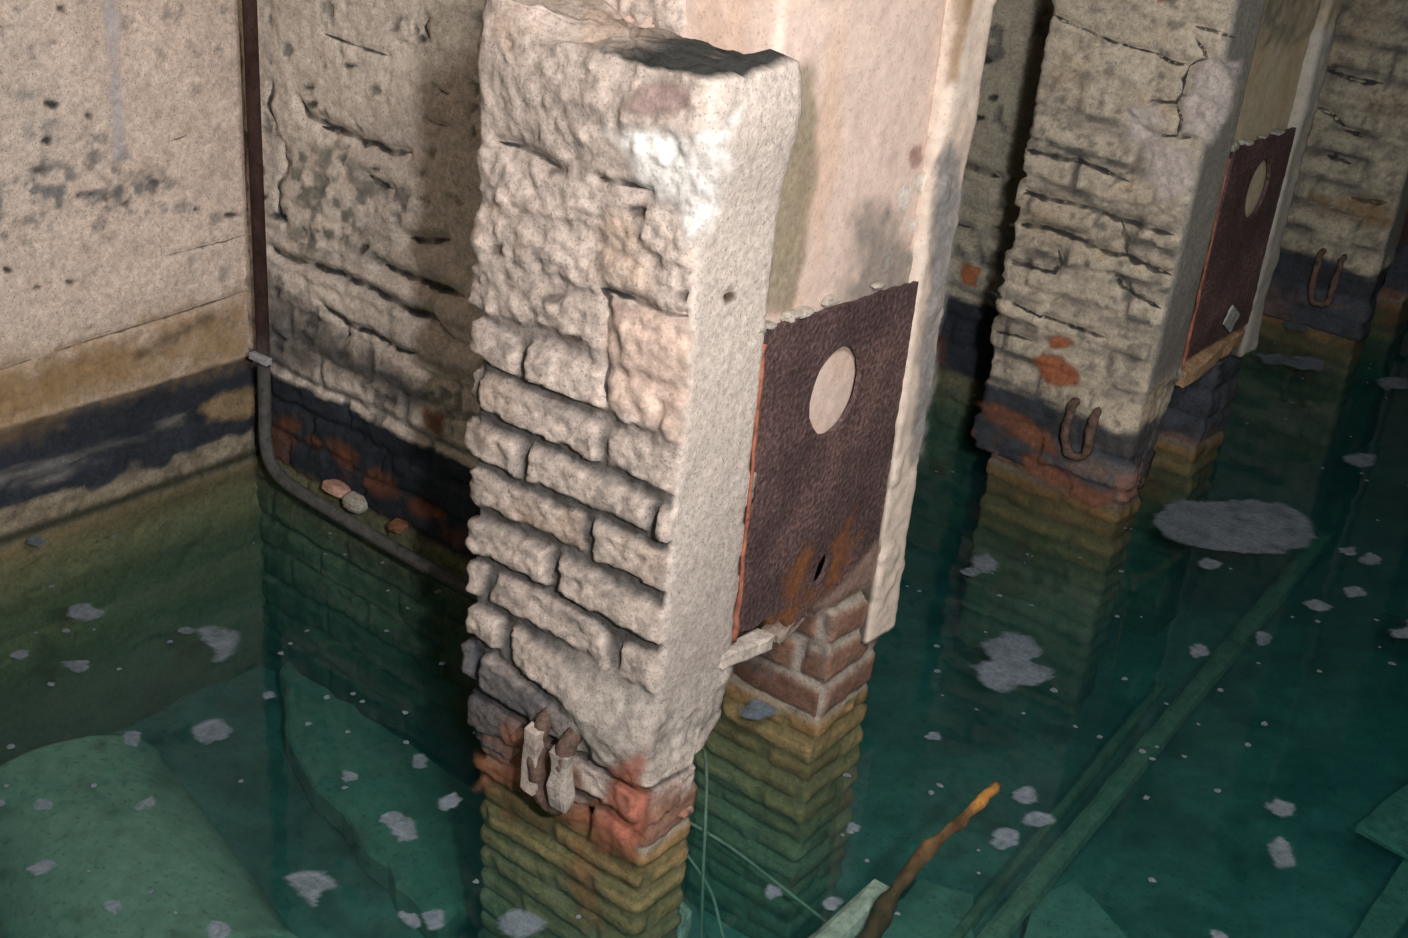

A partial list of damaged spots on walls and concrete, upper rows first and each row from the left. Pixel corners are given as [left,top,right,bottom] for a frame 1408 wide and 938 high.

crack [1051,13,1236,139]
crack [1027,149,1130,182]
crack [975,166,1174,309]
rust [1182,158,1231,369]
crack [990,291,1103,341]
rust [732,343,767,643]
flaking render [985,405,1111,505]
rust [816,540,881,609]
flaking render [477,760,540,807]
flaking render [558,757,651,861]